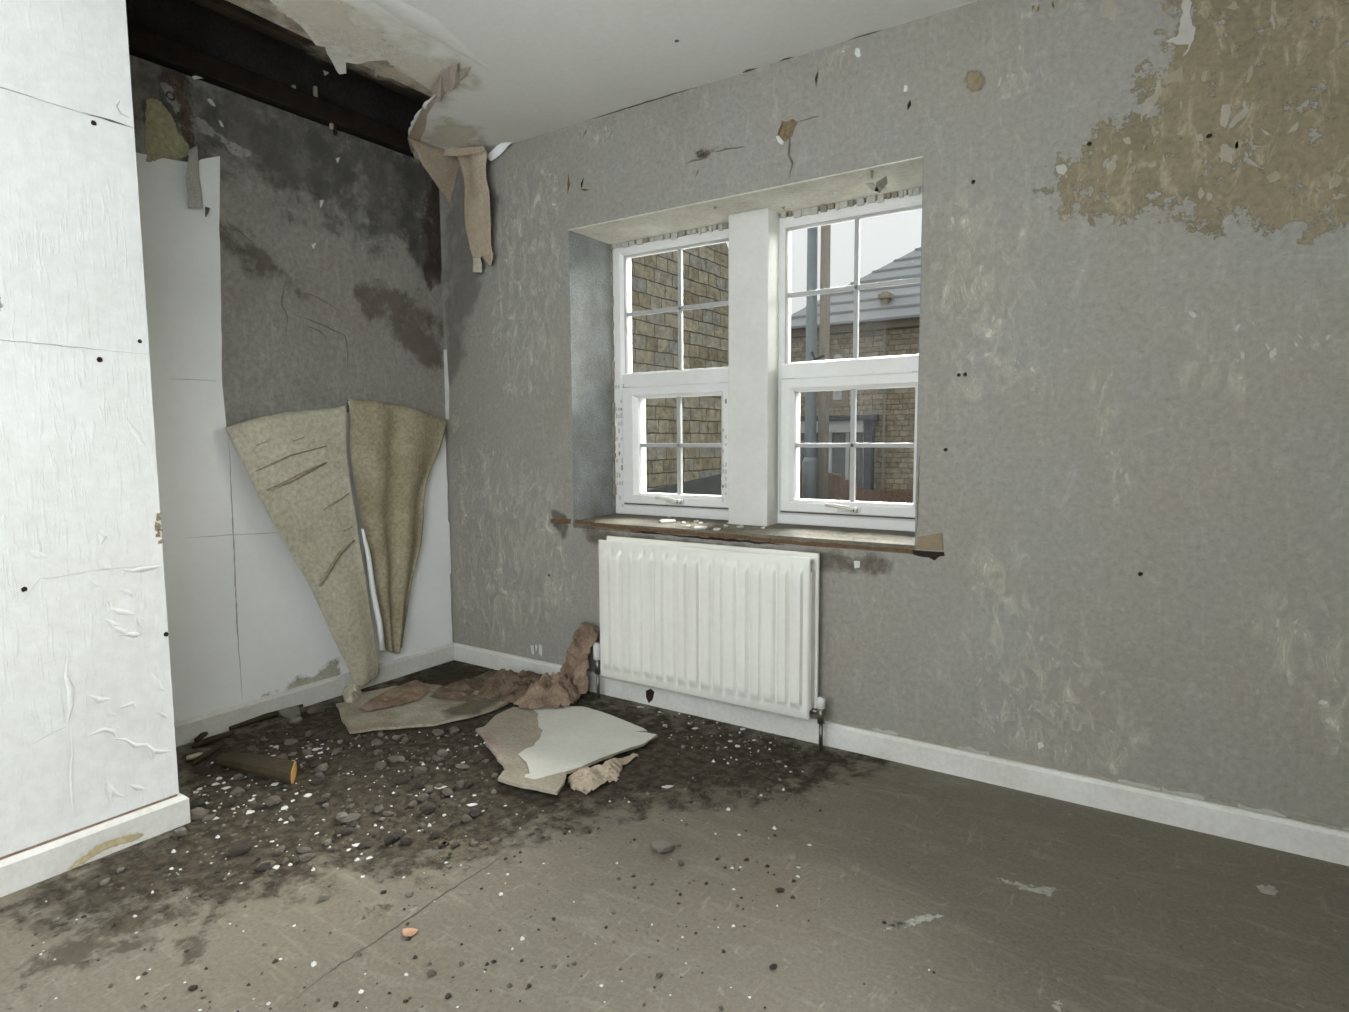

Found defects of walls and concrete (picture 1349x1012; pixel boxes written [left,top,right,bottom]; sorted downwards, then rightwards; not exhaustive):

water stain [138,66,442,290]
flaking render [1033,0,1349,245]
water stain [355,286,443,367]